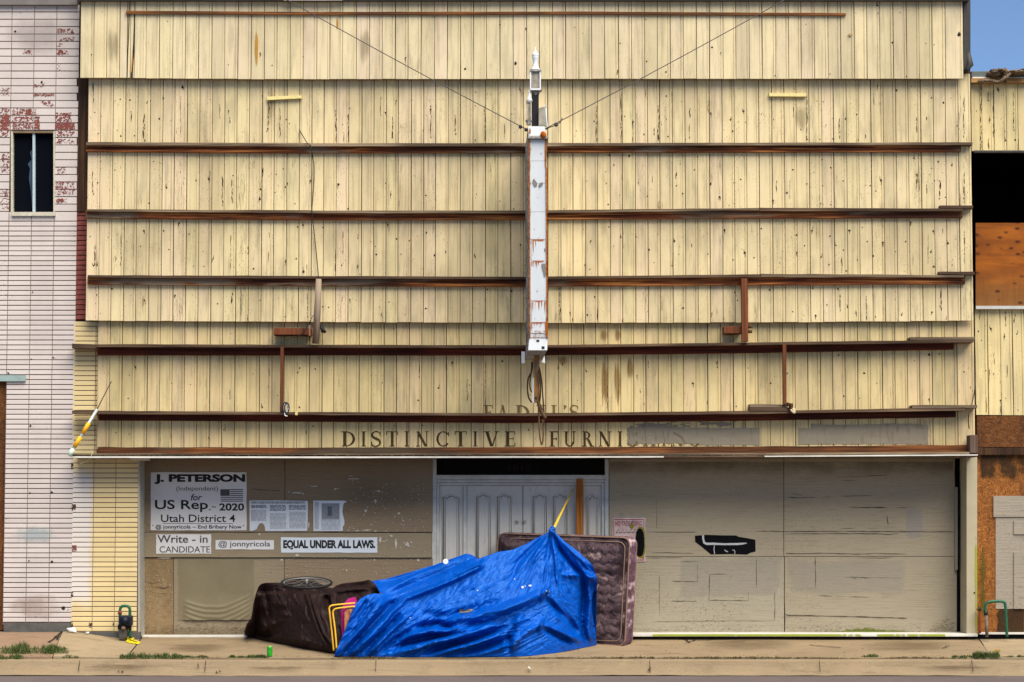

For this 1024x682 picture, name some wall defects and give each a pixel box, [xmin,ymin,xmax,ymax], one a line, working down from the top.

peeling [0,81,75,144]
peeling [55,167,75,203]
rust [530,293,547,338]